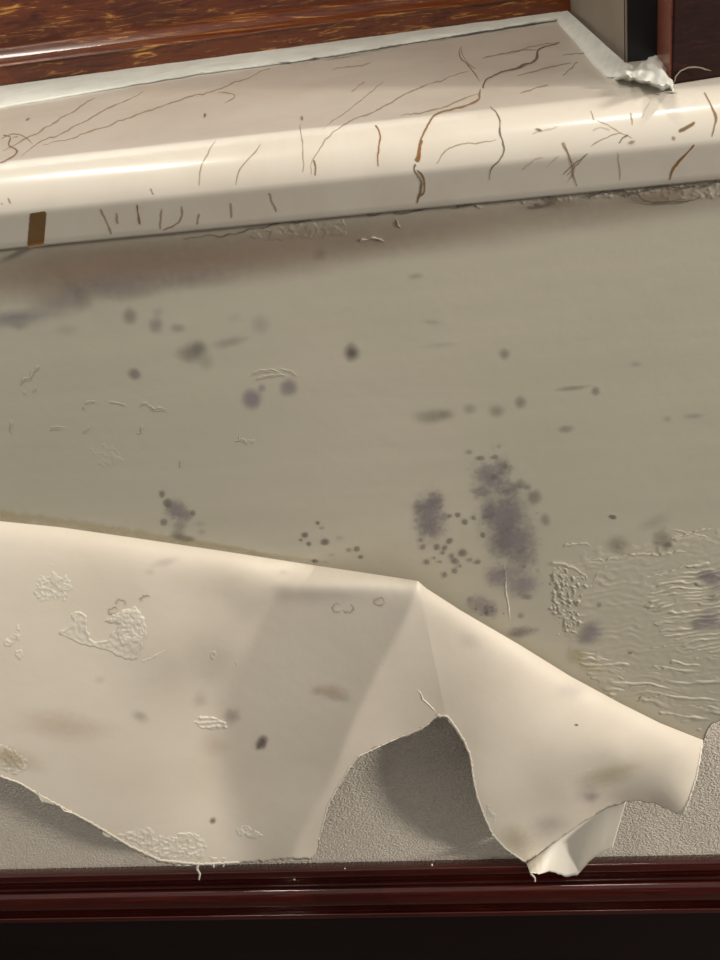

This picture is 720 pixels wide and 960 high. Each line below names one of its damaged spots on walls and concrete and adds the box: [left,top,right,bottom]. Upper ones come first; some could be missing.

crack [0,135,18,163]
crack [279,21,560,203]
crack [562,143,577,186]
crack [670,92,717,179]
peeling [0,521,714,866]